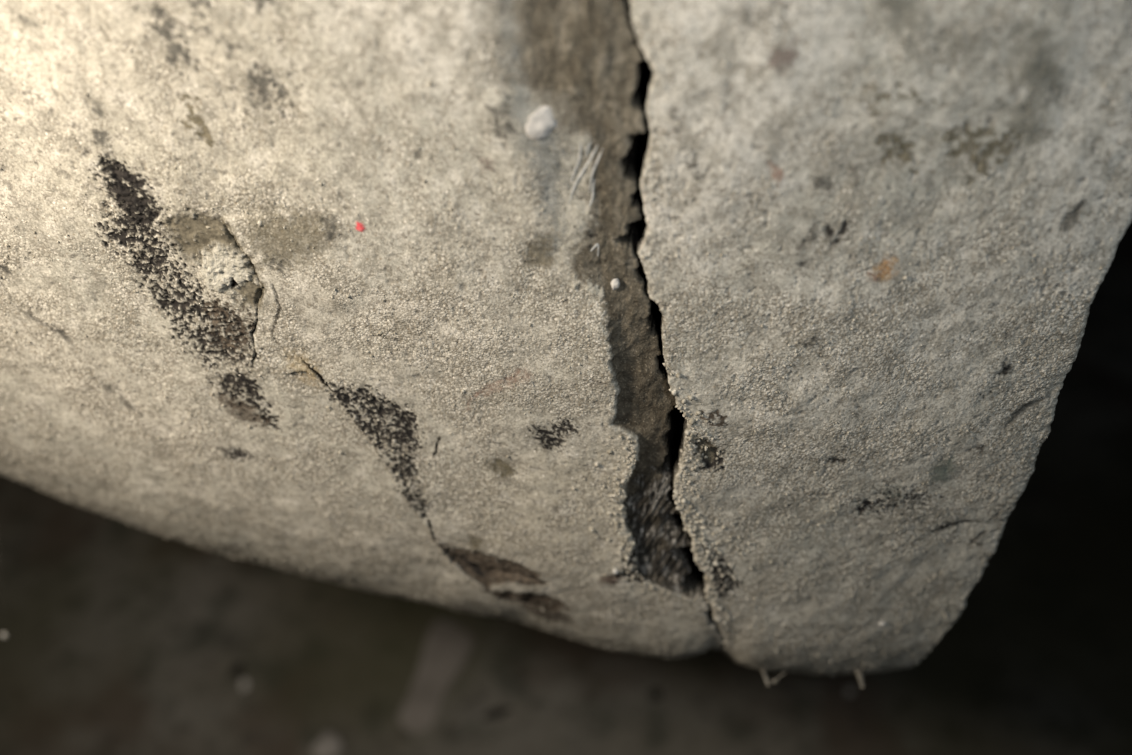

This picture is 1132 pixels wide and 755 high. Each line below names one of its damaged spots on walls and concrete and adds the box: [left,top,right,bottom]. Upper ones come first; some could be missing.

crack [231,259,281,363]
spalling [485,0,742,598]
crack [572,0,779,648]